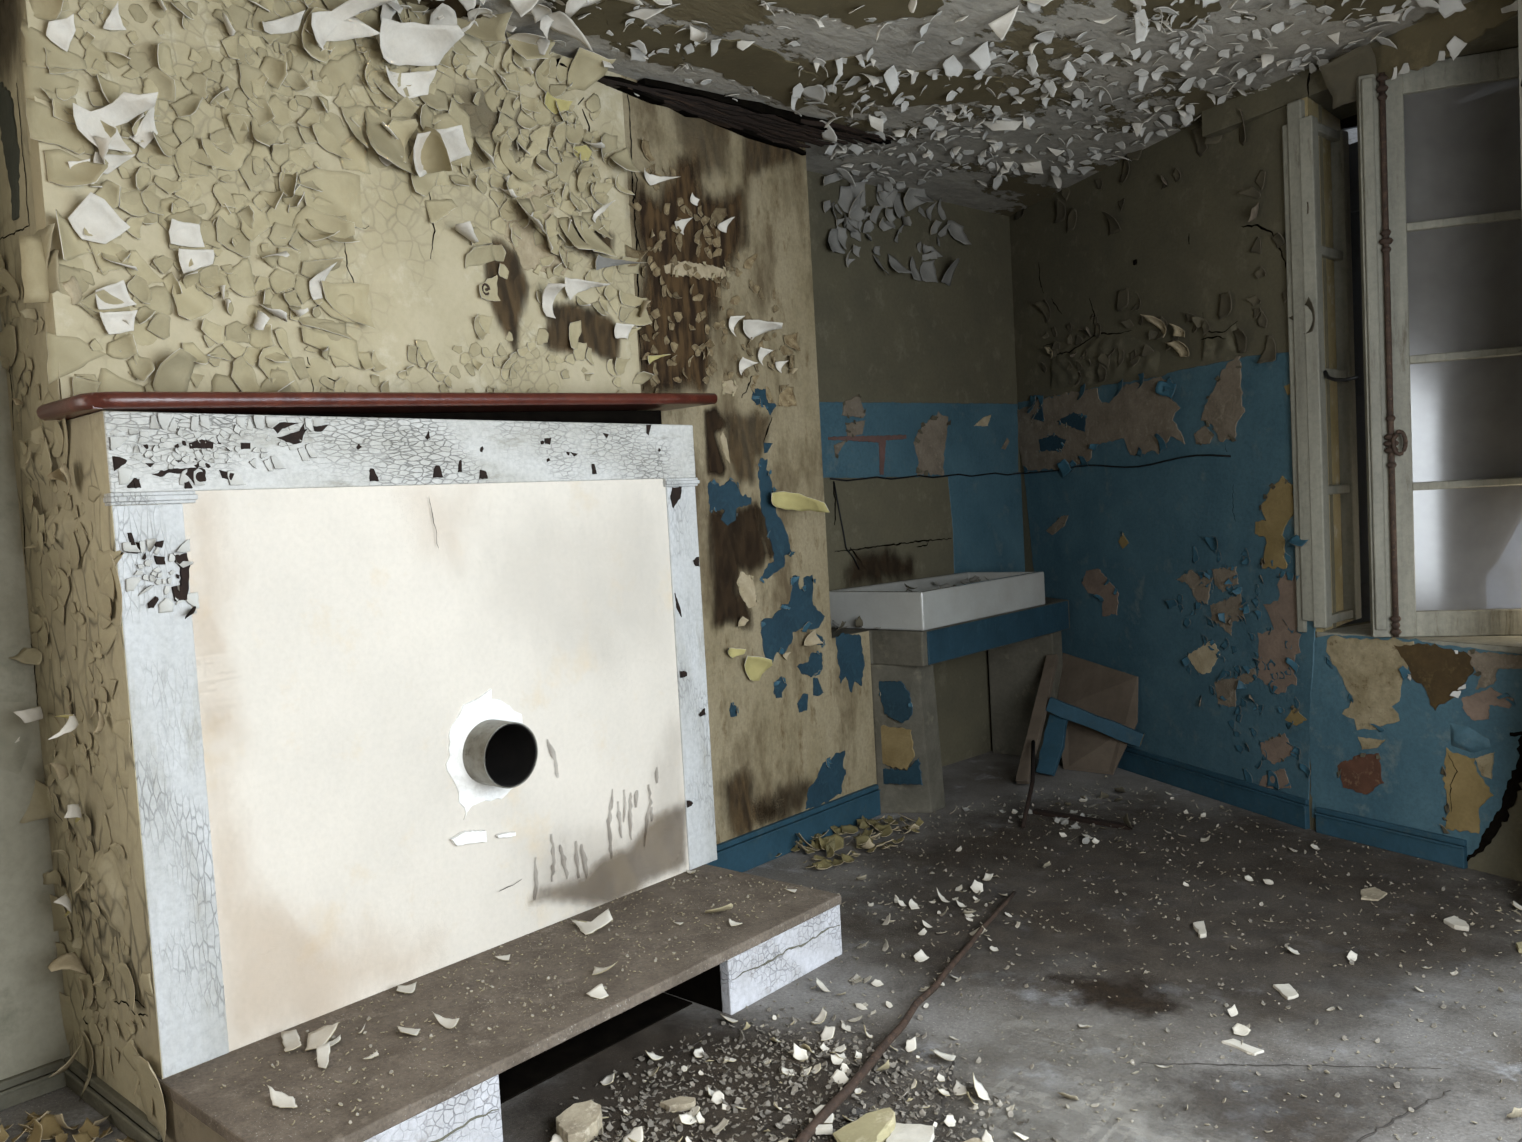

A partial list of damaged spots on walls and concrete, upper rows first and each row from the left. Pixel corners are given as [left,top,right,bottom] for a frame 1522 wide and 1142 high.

peeling [0,0,1518,423]
flaking render [1001,170,1285,478]
peeling [110,413,328,489]
peeling [433,460,488,479]
peeling [540,438,597,474]
peeling [670,486,682,508]
flaking render [737,571,766,628]
flaking render [1165,476,1311,790]
flaking render [1326,635,1522,795]
peeling [0,412,199,1142]
flaking render [1439,747,1495,834]
leakage [1074,978,1176,1017]